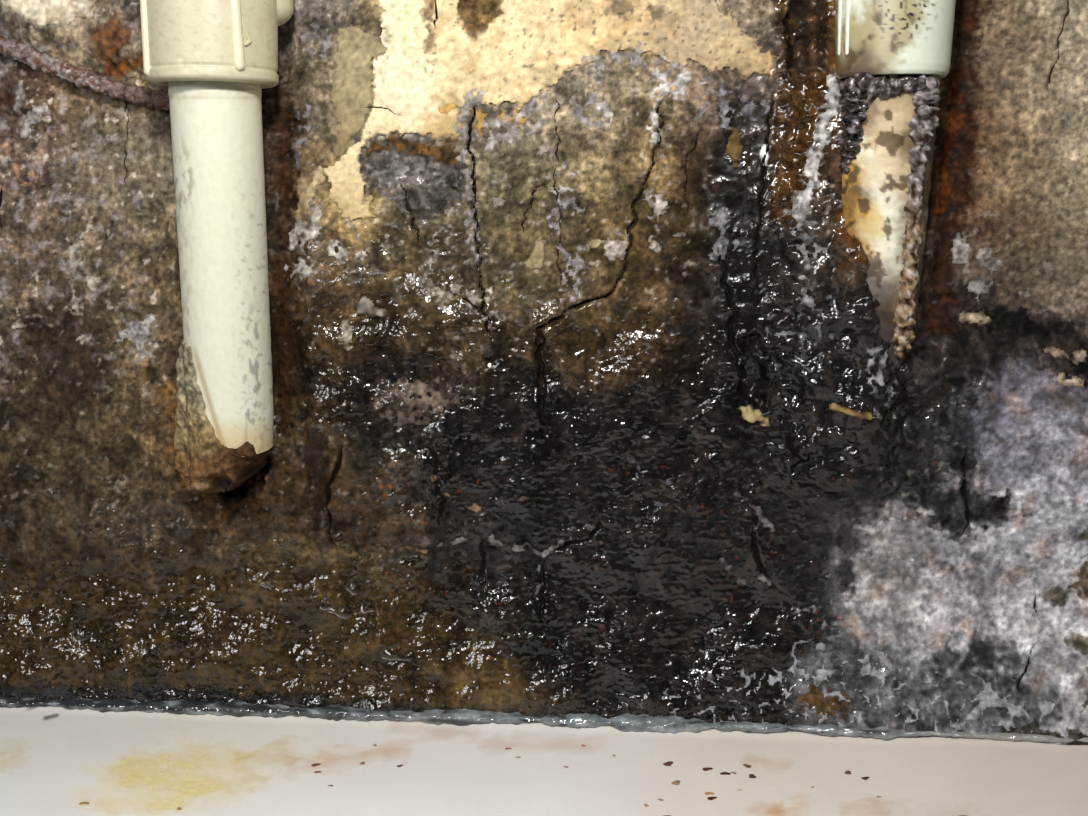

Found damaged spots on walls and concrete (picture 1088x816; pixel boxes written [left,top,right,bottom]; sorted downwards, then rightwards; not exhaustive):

rust [0,19,170,110]
water stain [284,201,322,279]
crack [401,184,419,243]
crack [449,104,492,341]
peeling [291,0,777,227]
peeling [526,241,545,270]
crack [521,100,665,436]
rust [777,11,837,219]
rust [922,0,980,333]
water stain [301,0,1088,745]
water stain [0,551,80,659]
water stain [0,632,436,712]